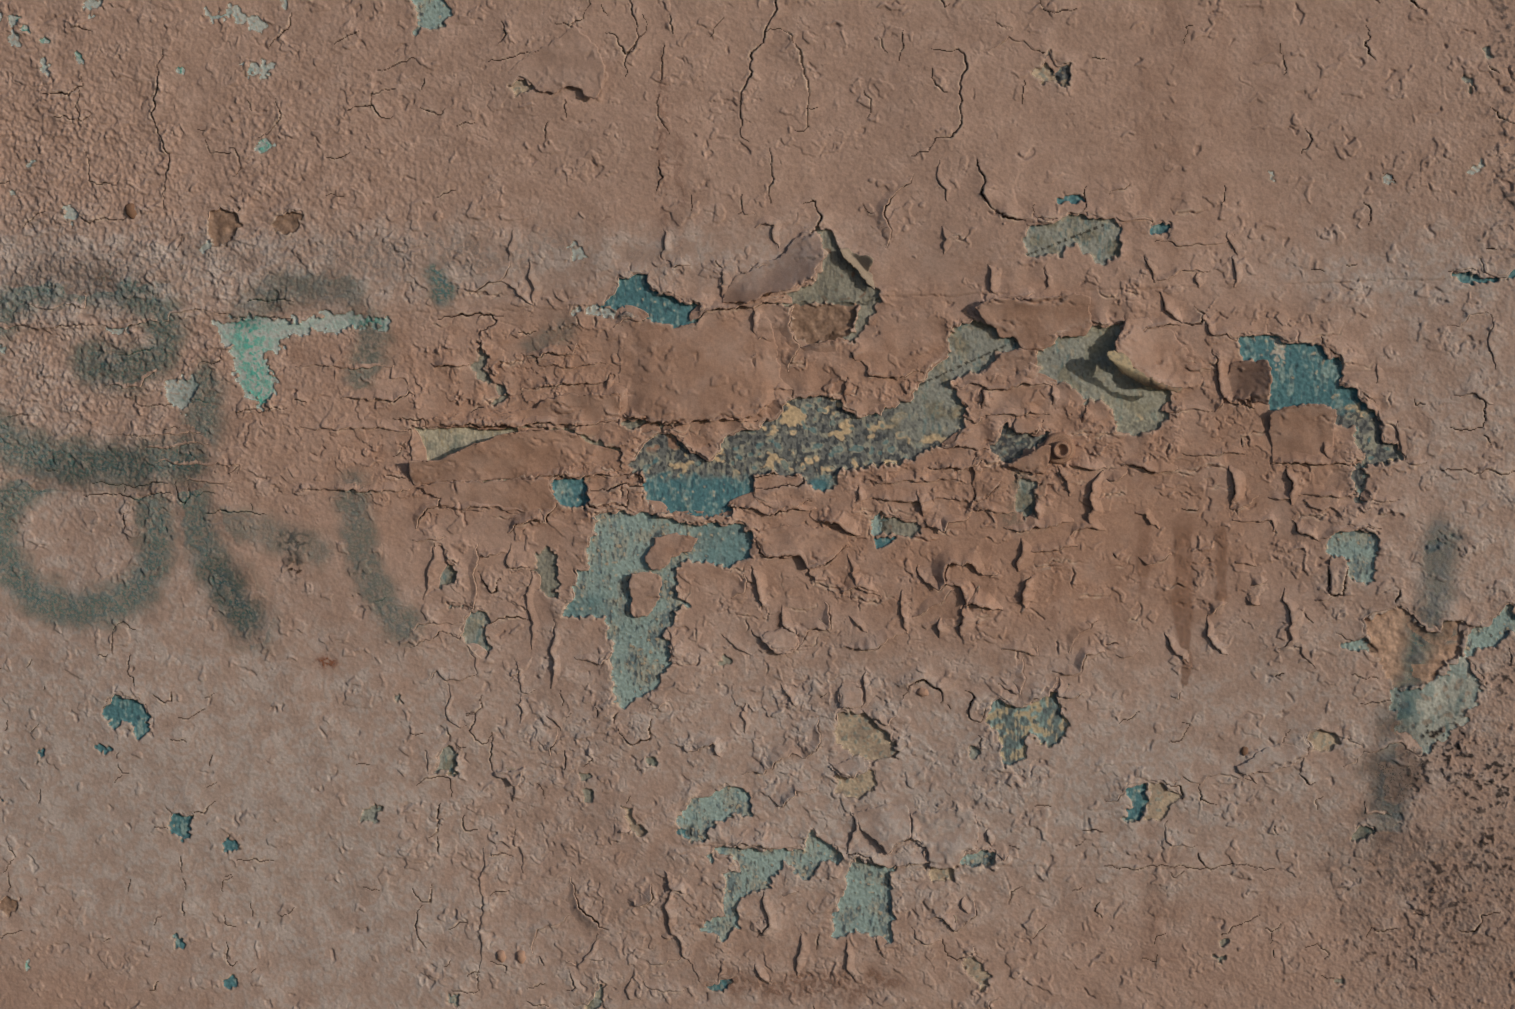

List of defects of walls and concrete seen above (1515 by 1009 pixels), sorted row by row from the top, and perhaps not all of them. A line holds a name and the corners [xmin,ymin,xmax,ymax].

crack [1364,0,1426,60]
crack [862,0,1130,254]
peeling [571,268,702,328]
peeling [722,227,882,344]
crack [0,0,1022,1009]
peeling [408,292,1203,709]
crack [690,185,1515,918]
peeling [1228,325,1403,504]
peeling [1341,602,1515,757]
peeling [676,682,996,944]
crack [1221,915,1334,979]
crack [1461,912,1501,933]